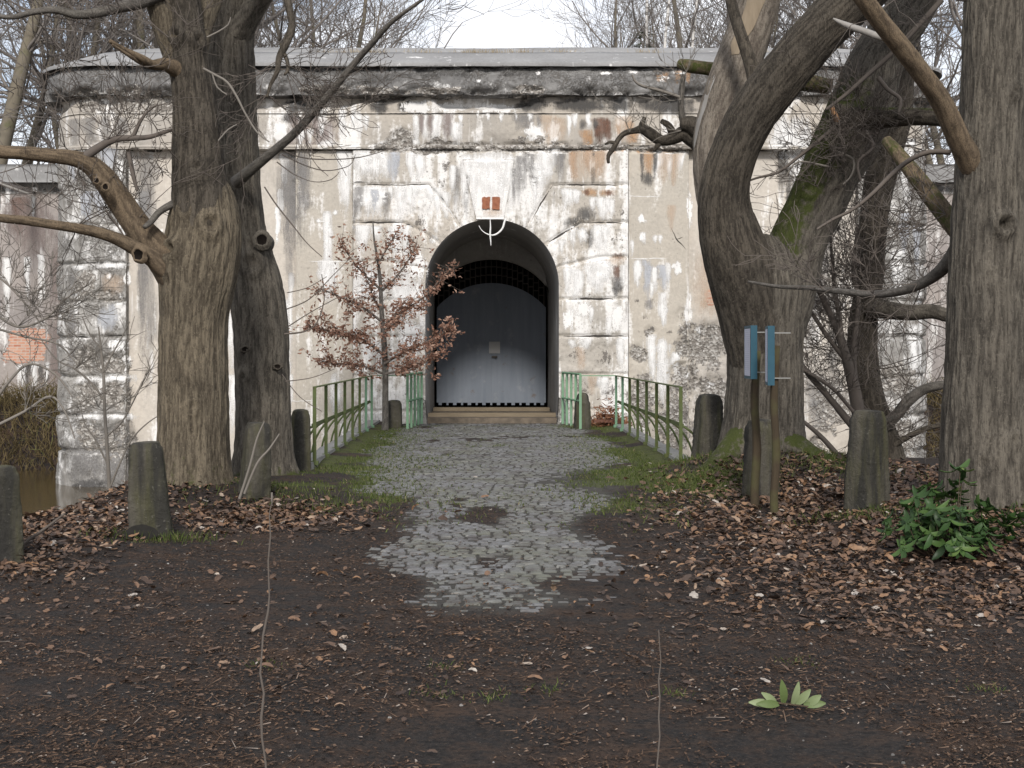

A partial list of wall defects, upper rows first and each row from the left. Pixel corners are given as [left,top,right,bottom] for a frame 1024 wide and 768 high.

water stain [272,96,694,360]
rust [570,118,658,184]
water stain [558,188,682,402]